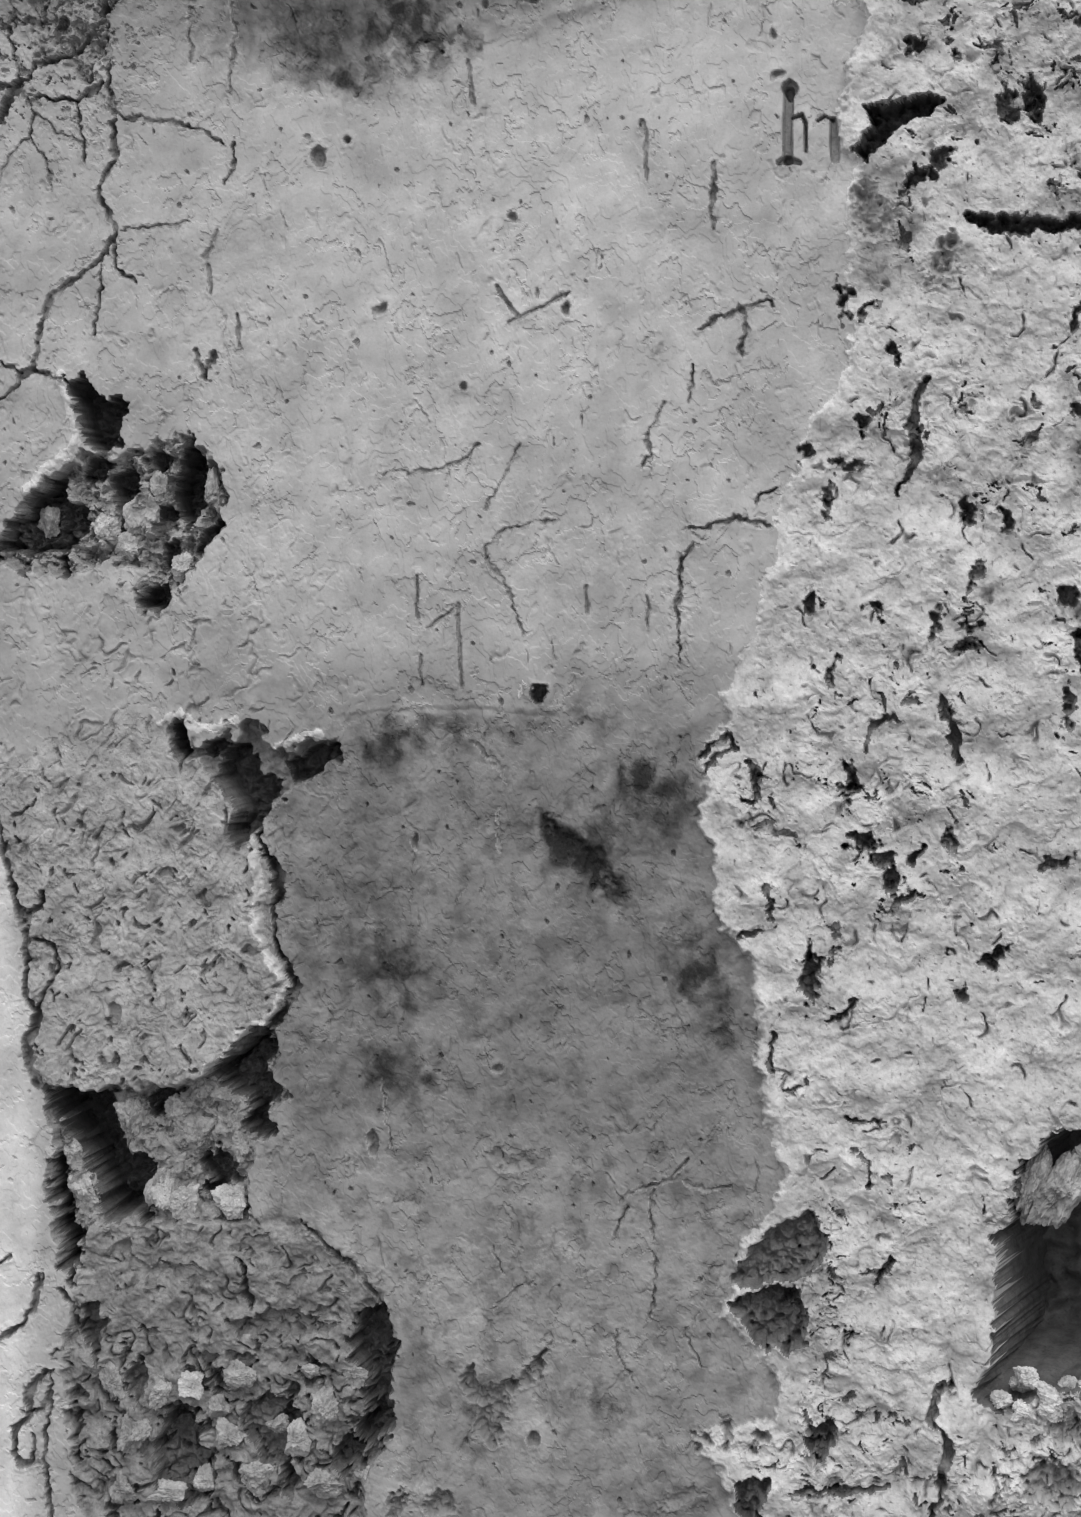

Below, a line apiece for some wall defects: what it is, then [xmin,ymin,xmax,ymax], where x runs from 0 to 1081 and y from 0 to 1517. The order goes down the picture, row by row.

crack [0,0,241,401]
spalling [0,369,230,618]
spalling [170,719,343,851]
spalling [696,0,1081,1517]
crack [0,821,62,1091]
spalling [206,1033,289,1141]
spalling [43,1086,402,1517]